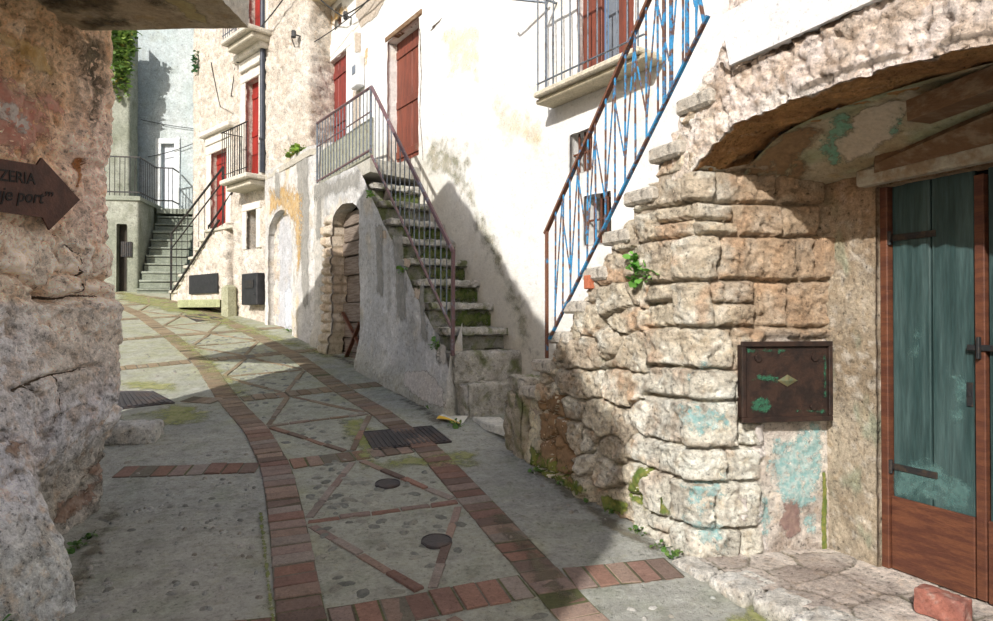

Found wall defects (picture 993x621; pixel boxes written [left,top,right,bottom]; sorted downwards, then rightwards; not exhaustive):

water stain [42,0,131,133]
flaking render [819,100,907,165]
water stain [427,143,472,202]
water stain [476,217,503,275]
peeling [753,398,771,412]
peeling [752,410,824,533]